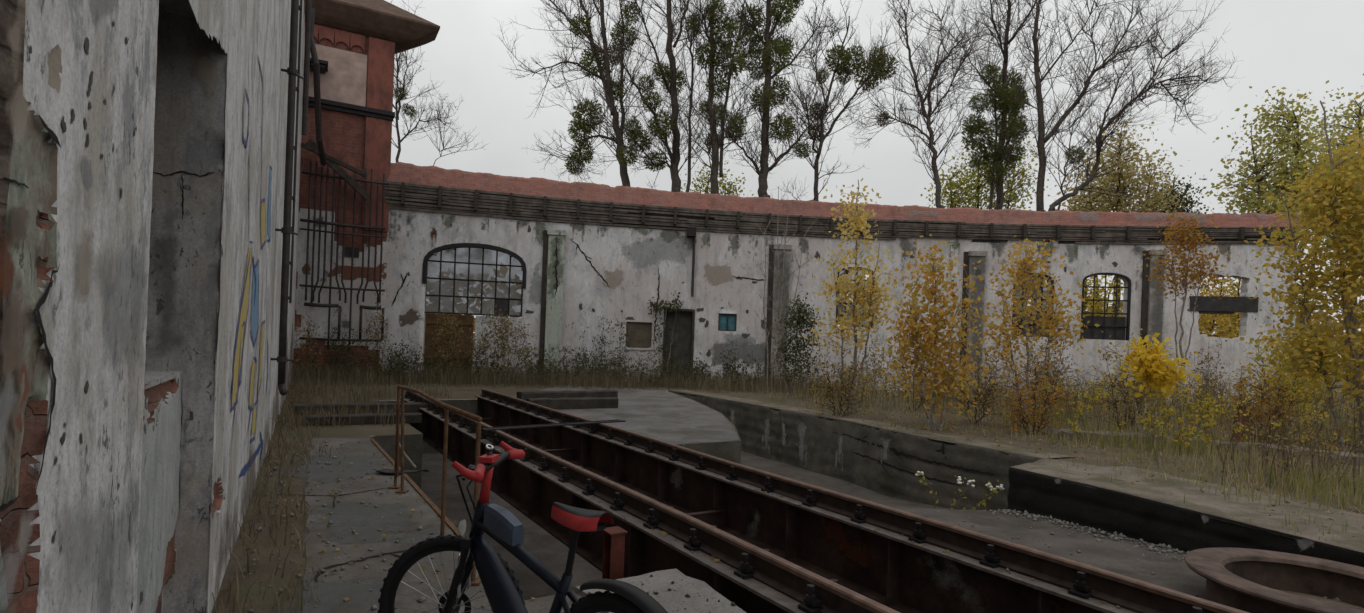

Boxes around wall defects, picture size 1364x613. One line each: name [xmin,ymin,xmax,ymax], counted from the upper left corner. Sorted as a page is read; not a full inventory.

peeling [0,0,114,613]
crack [153,65,227,371]
peeling [294,208,422,350]
crack [553,239,610,295]
spalling [143,373,179,434]